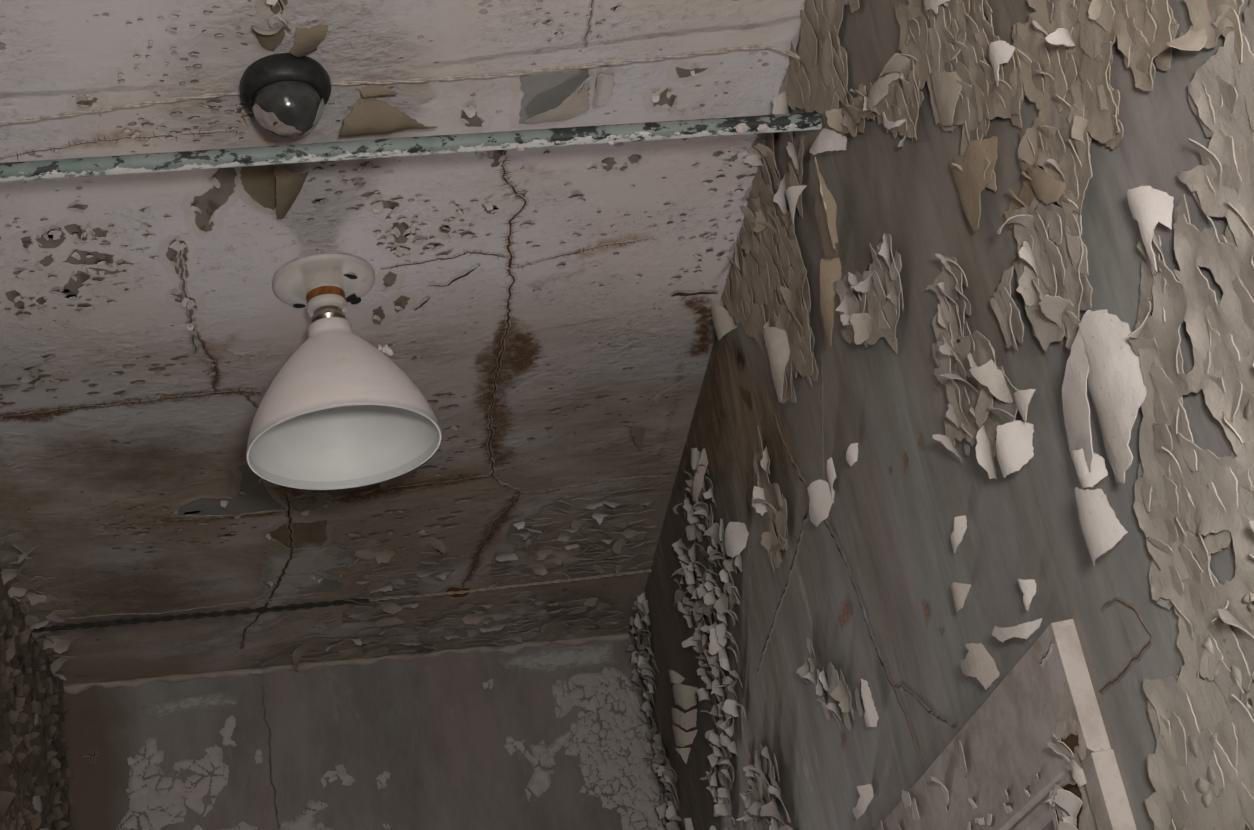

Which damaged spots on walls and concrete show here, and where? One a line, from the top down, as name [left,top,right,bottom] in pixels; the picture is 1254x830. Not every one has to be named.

crack [582,0,595,47]
crack [0,248,267,421]
peeling [0,161,508,337]
crack [333,150,662,589]
peeling [588,148,652,189]
peeling [663,0,1254,830]
peeling [0,532,76,830]
crack [63,487,323,649]
peeling [98,425,793,830]